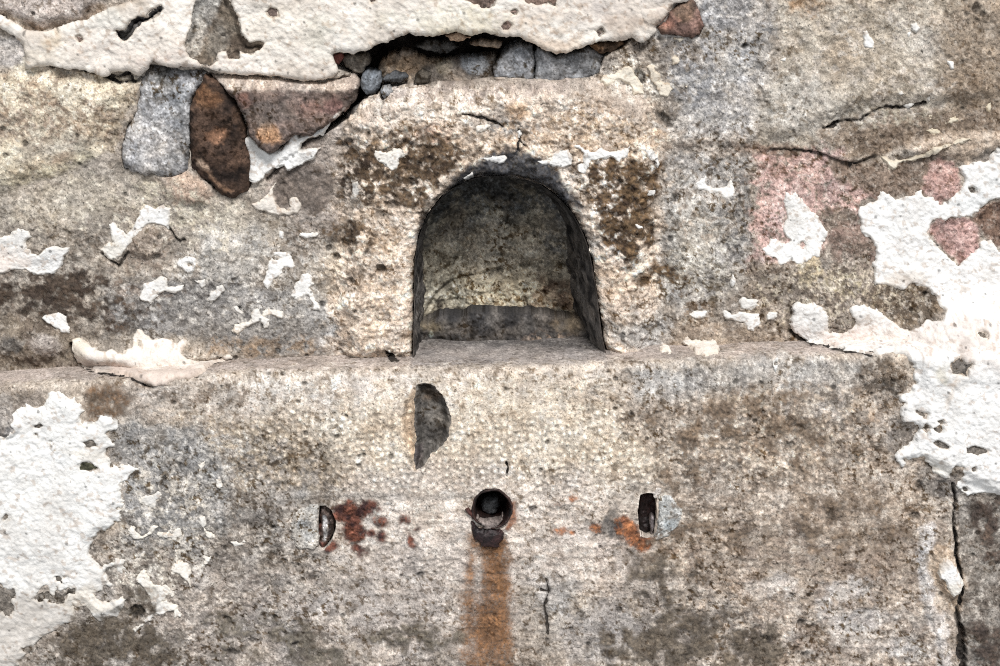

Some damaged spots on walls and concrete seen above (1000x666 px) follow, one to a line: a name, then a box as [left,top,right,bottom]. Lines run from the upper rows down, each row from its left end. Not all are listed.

peeling [0,0,689,82]
crack [823,100,927,128]
crack [773,148,868,167]
peeling [0,228,70,275]
peeling [762,192,828,265]
peeling [789,147,1000,496]
peeling [0,391,192,666]
corrosion [324,499,387,557]
corrosion [400,515,420,548]
corrosion [613,516,654,552]
corrosion [462,533,513,666]
crack [951,482,966,666]